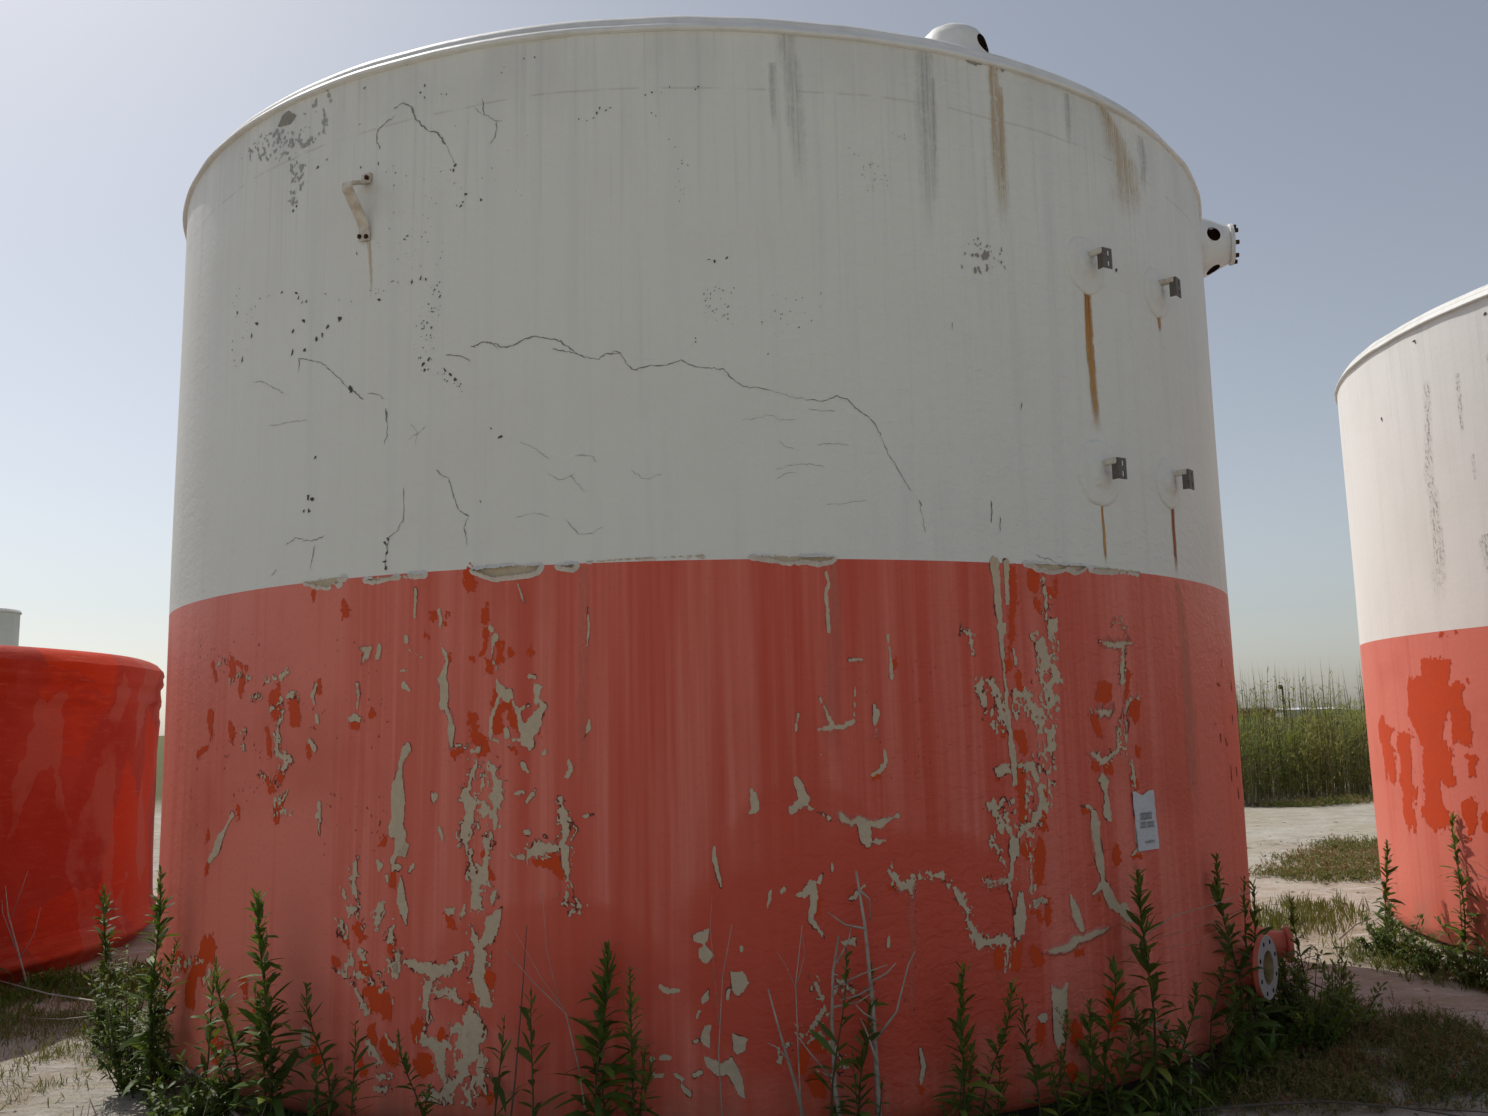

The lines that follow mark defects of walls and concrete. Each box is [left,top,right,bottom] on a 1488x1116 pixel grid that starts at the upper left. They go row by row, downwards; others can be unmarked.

crack [376,102,455,164]
rust [1085,294,1097,413]
crack [445,336,926,534]
peeling [186,629,325,876]
peeling [304,538,594,1110]
peeling [789,776,900,849]
peeling [848,556,1148,973]
peeling [1378,630,1488,841]
peeling [767,862,857,948]
peeling [173,933,217,1015]
peeling [649,971,750,1099]
peeling [1035,981,1085,1085]